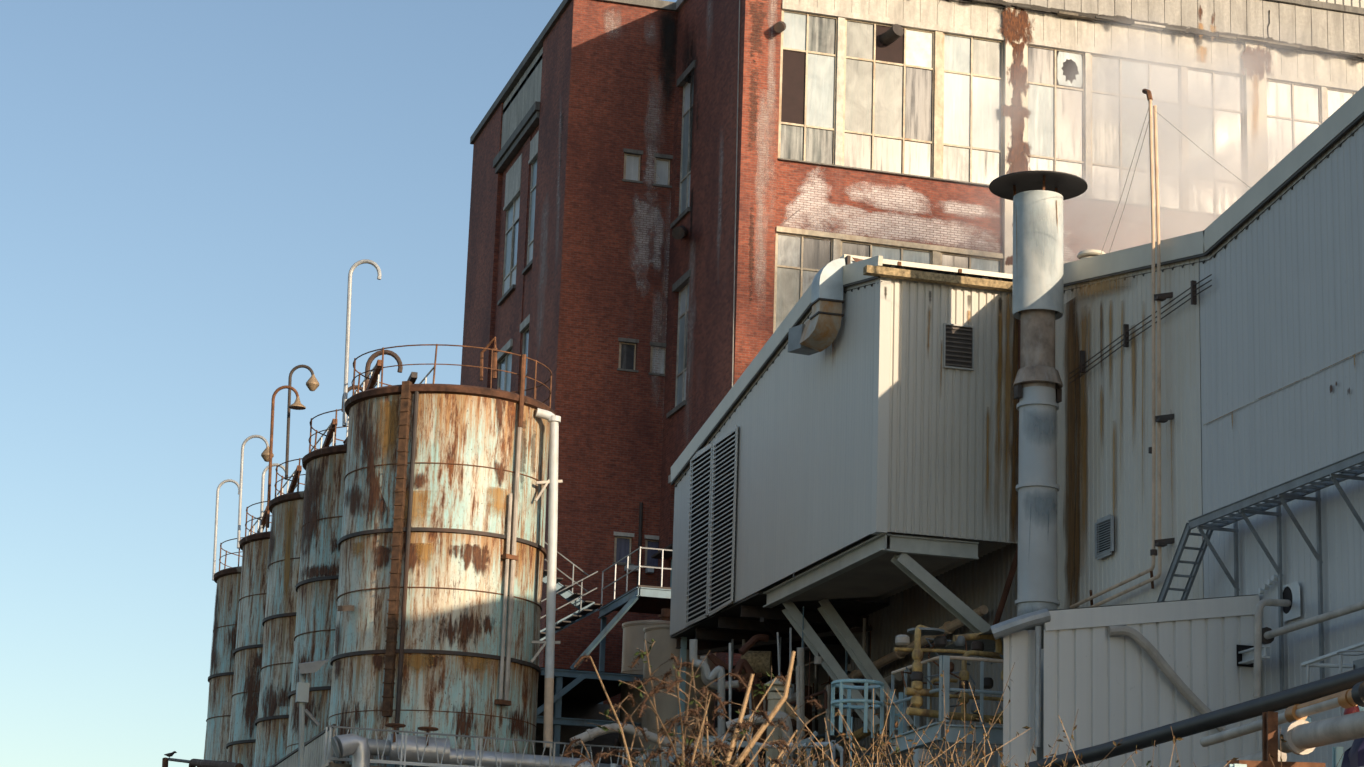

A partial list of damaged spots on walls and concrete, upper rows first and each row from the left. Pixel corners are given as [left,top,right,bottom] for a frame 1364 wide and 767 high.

corrosion [1000,7,1034,174]
efflorescence [784,173,1002,251]
efflorescence [633,201,671,371]
corrosion [268,397,432,598]
corrosion [490,461,507,513]
corrosion [494,388,506,431]
corrosion [1064,278,1144,608]
corrosion [450,544,489,575]
corrosion [209,589,236,681]
corrosion [408,612,495,670]
corrosion [242,652,322,740]
corrosion [453,701,477,741]